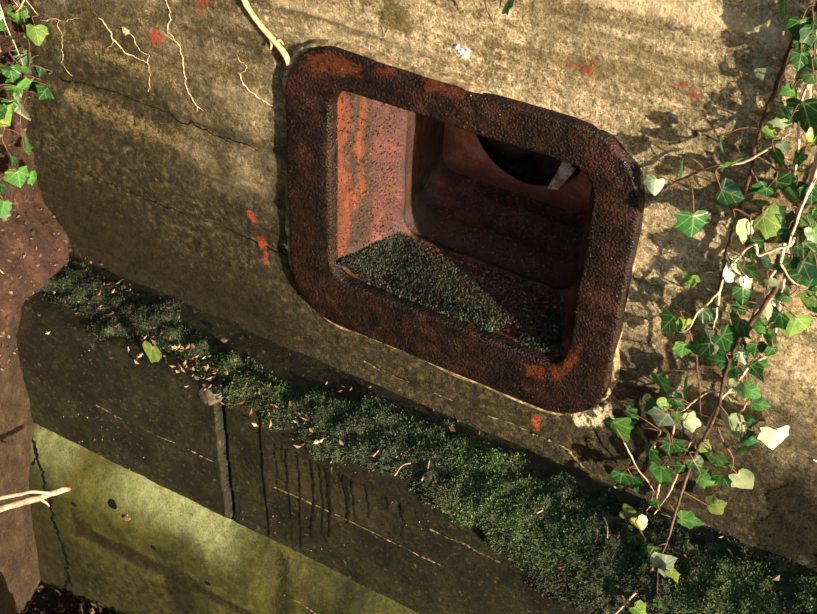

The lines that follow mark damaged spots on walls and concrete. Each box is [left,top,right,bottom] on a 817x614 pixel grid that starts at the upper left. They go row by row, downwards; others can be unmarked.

crack [42,0,257,151]
rust [255,236,269,263]
crack [31,435,73,597]
damp [274,445,356,550]